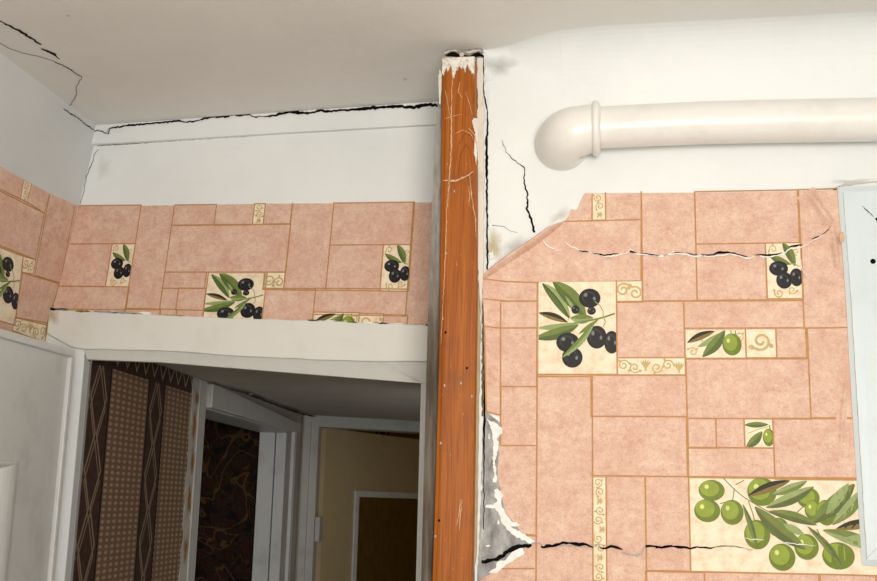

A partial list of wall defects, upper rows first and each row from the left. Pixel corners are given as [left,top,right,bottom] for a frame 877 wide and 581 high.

crack [0,21,438,204]
crack [483,57,831,276]
crack [479,302,487,529]
peeling [477,412,535,581]
crack [482,538,761,564]